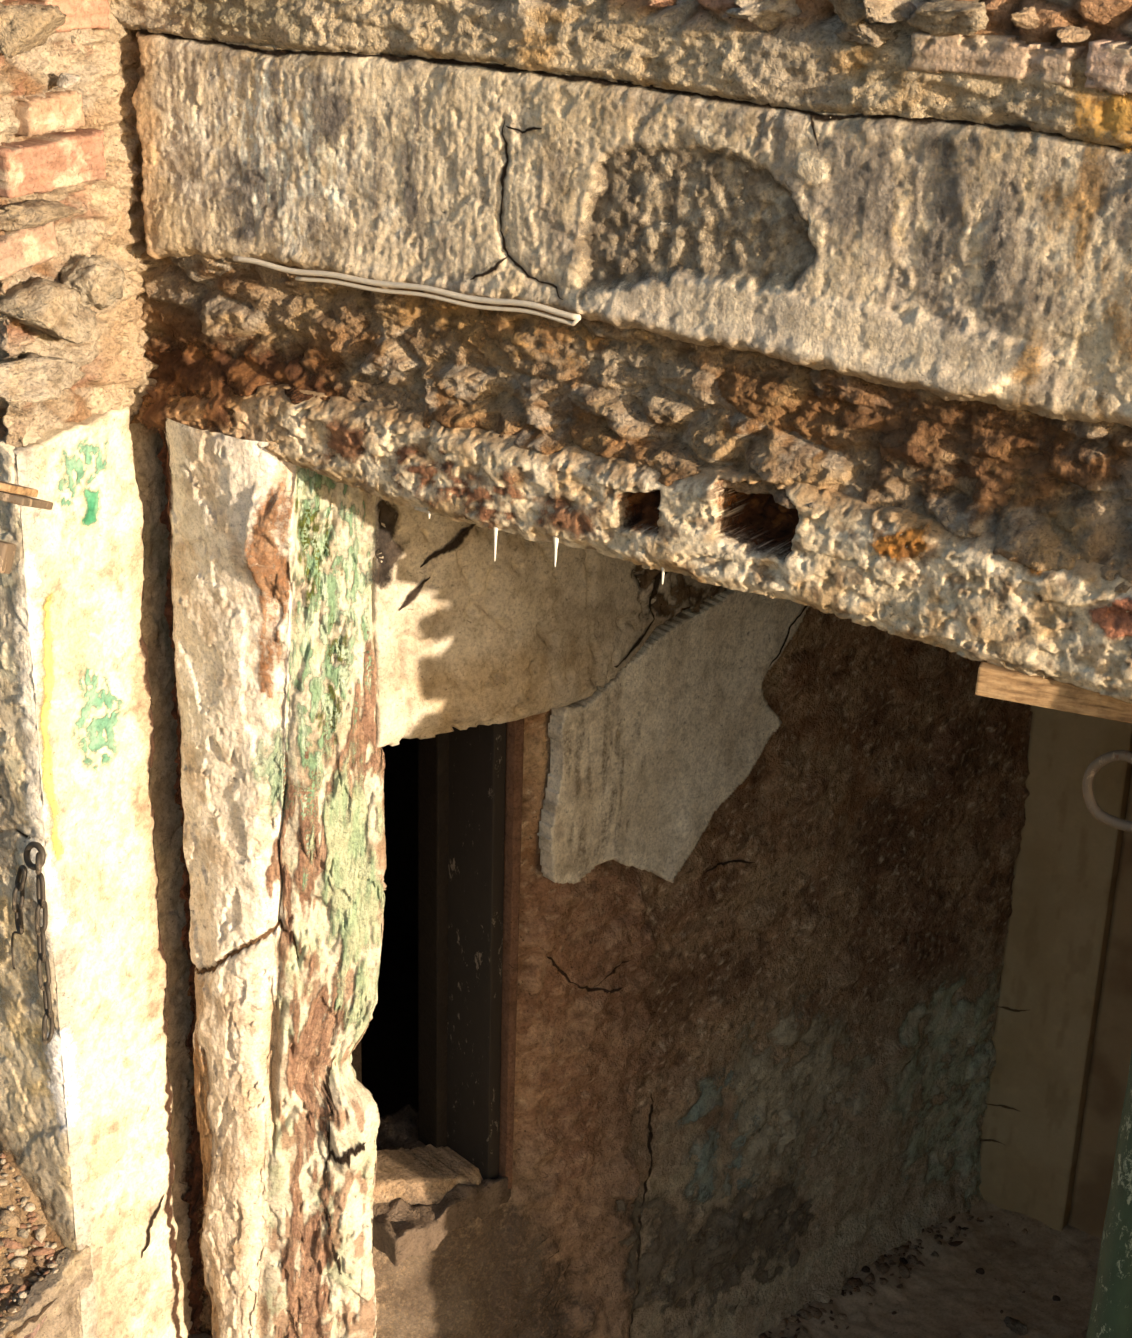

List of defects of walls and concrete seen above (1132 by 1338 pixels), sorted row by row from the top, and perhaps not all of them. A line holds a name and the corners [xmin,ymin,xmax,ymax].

leakage [230,154,278,244]
leakage [270,62,283,140]
leakage [309,70,427,226]
crack [470,120,563,300]
crack [139,29,1132,152]
spalling [617,490,661,534]
spalling [716,480,799,559]
flaking render [537,565,810,884]
crack [135,476,299,1338]